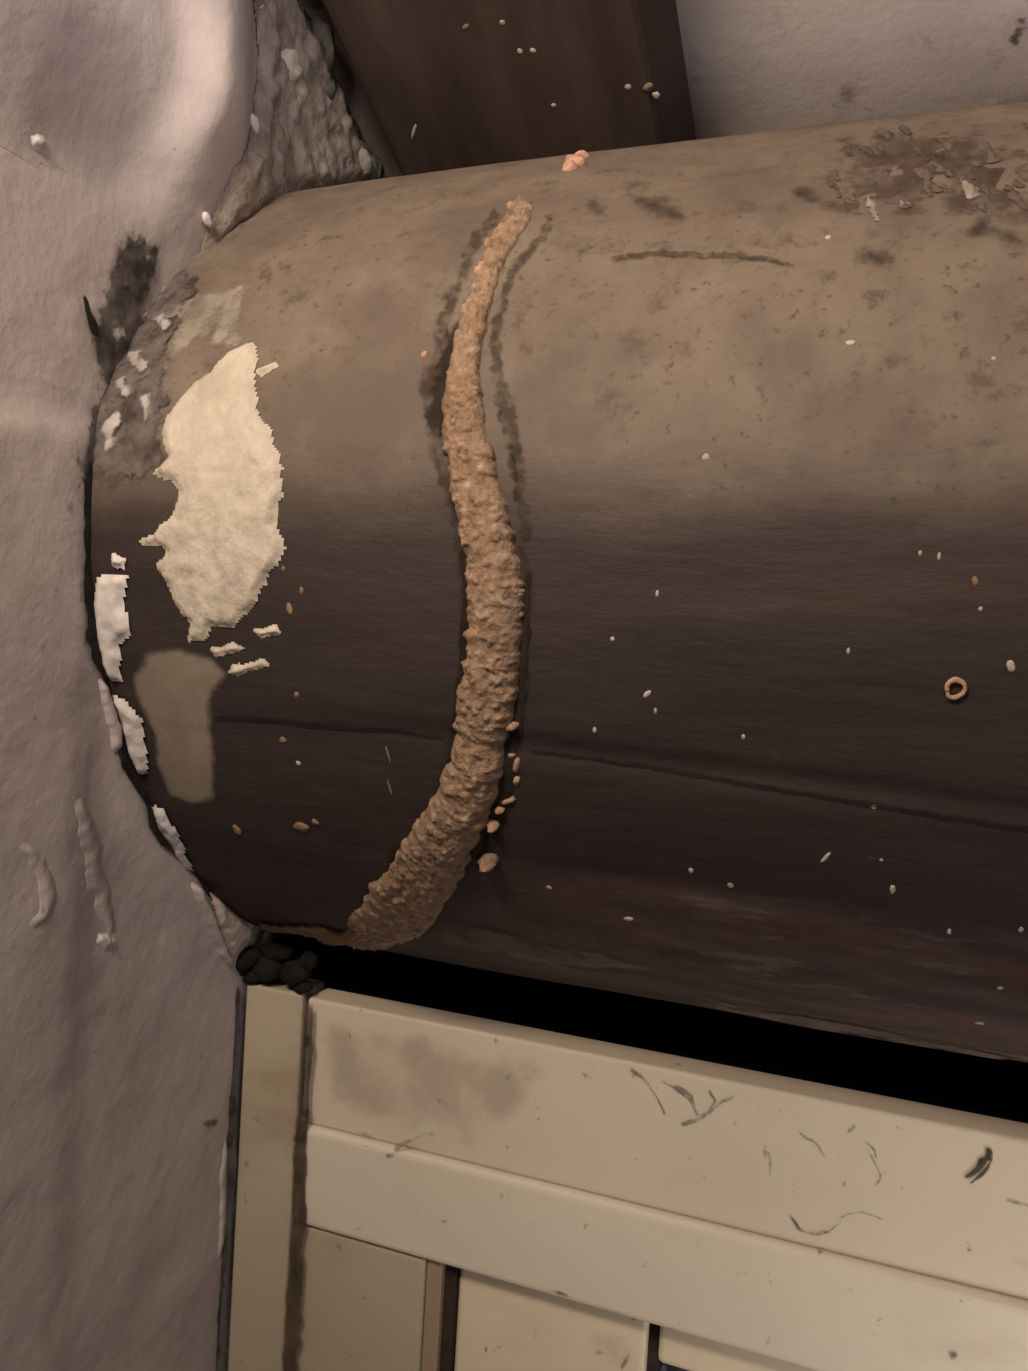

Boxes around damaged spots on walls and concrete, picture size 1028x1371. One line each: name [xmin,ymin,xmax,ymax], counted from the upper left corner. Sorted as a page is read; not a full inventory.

peeling [825,125,1028,221]
damp [77,232,199,489]
spalling [256,362,279,377]
spalling [253,624,281,638]
spalling [210,642,270,677]
crack [216,715,436,738]
crack [534,750,1028,831]